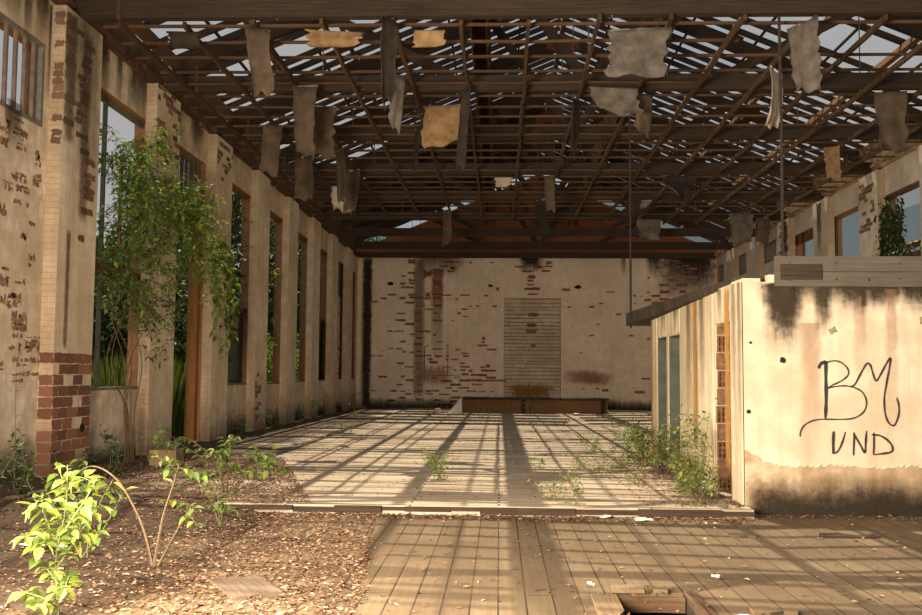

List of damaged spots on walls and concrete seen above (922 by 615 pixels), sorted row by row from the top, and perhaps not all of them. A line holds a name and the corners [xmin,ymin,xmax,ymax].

spalling [50,11,96,217]
peeling [0,118,42,216]
leakage [765,284,922,324]
spalling [0,266,92,476]
leakage [755,487,922,517]